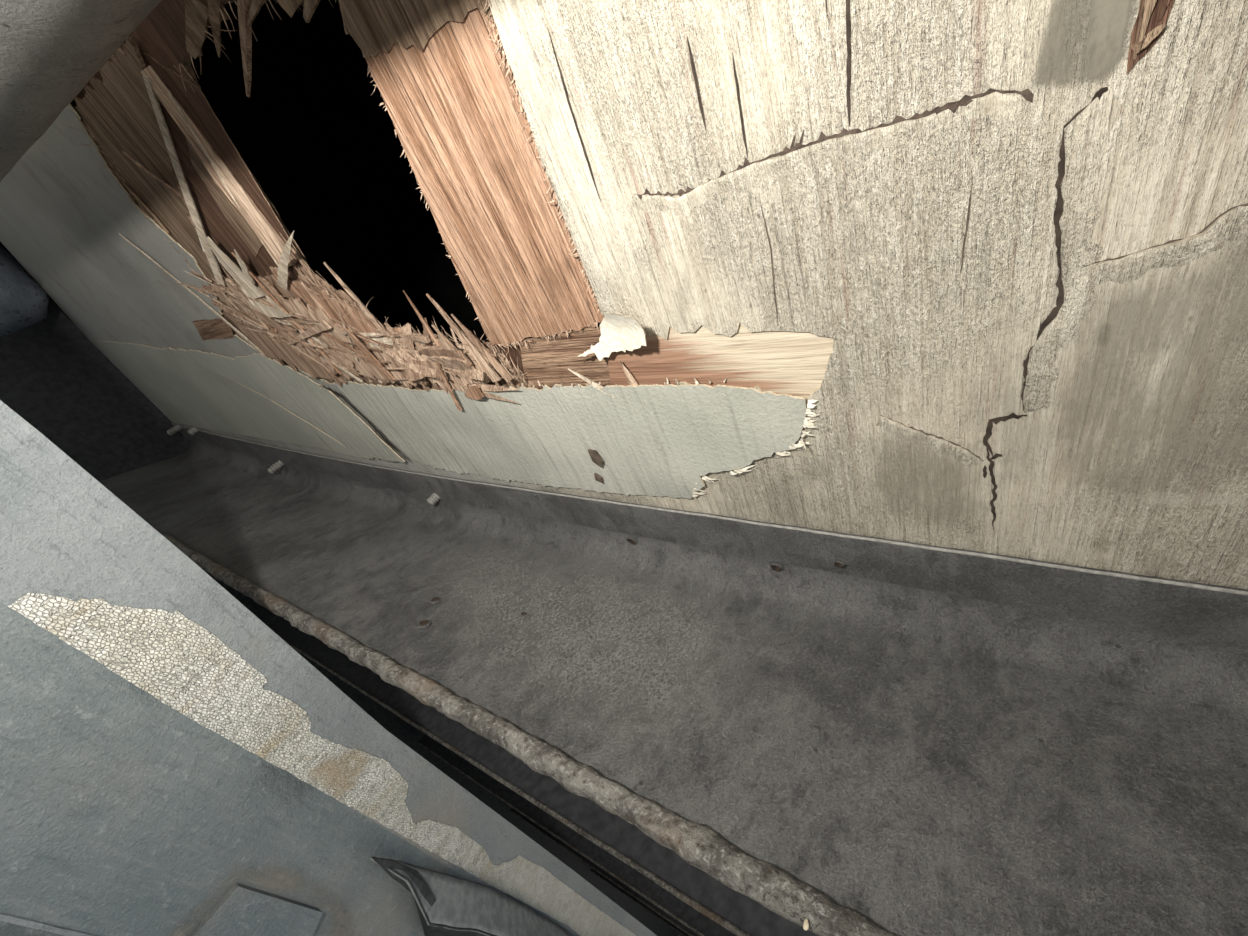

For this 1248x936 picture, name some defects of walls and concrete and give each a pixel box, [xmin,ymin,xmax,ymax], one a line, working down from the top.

spalling [69,0,834,411]
crack [631,88,1033,216]
crack [876,87,1248,529]